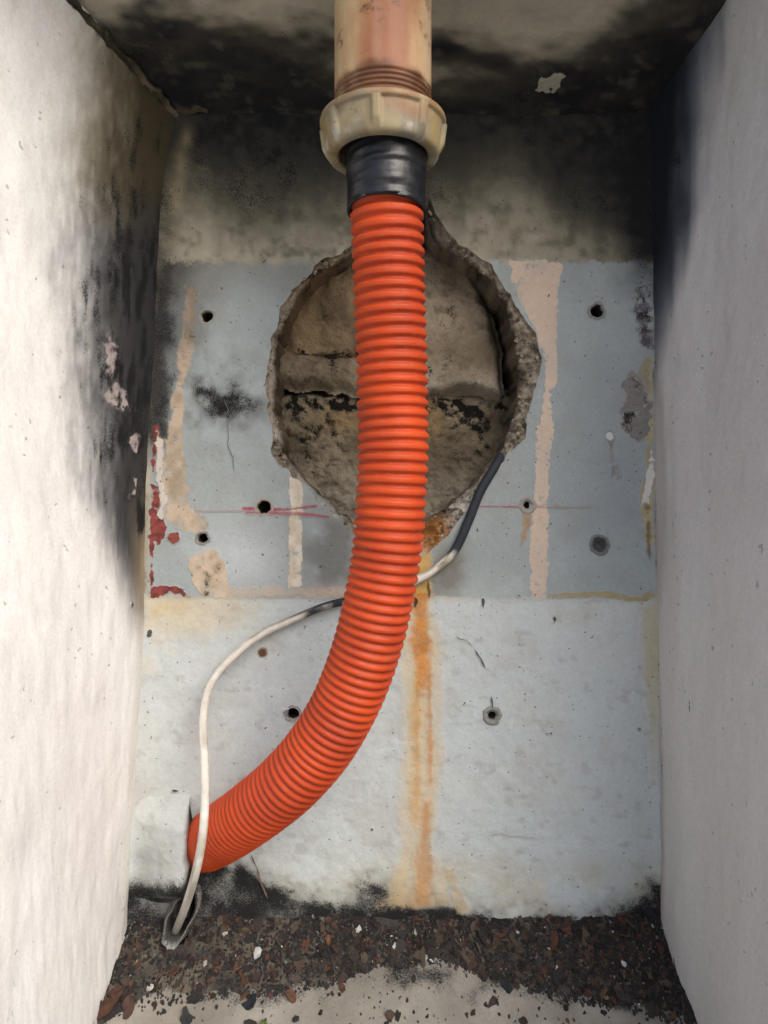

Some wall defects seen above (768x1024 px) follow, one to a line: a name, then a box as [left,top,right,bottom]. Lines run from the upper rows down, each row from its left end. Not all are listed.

peeling [533,70,568,95]
spalling [97,245,360,601]
spalling [421,197,565,602]
peeling [604,267,656,508]
rust [370,549,473,916]